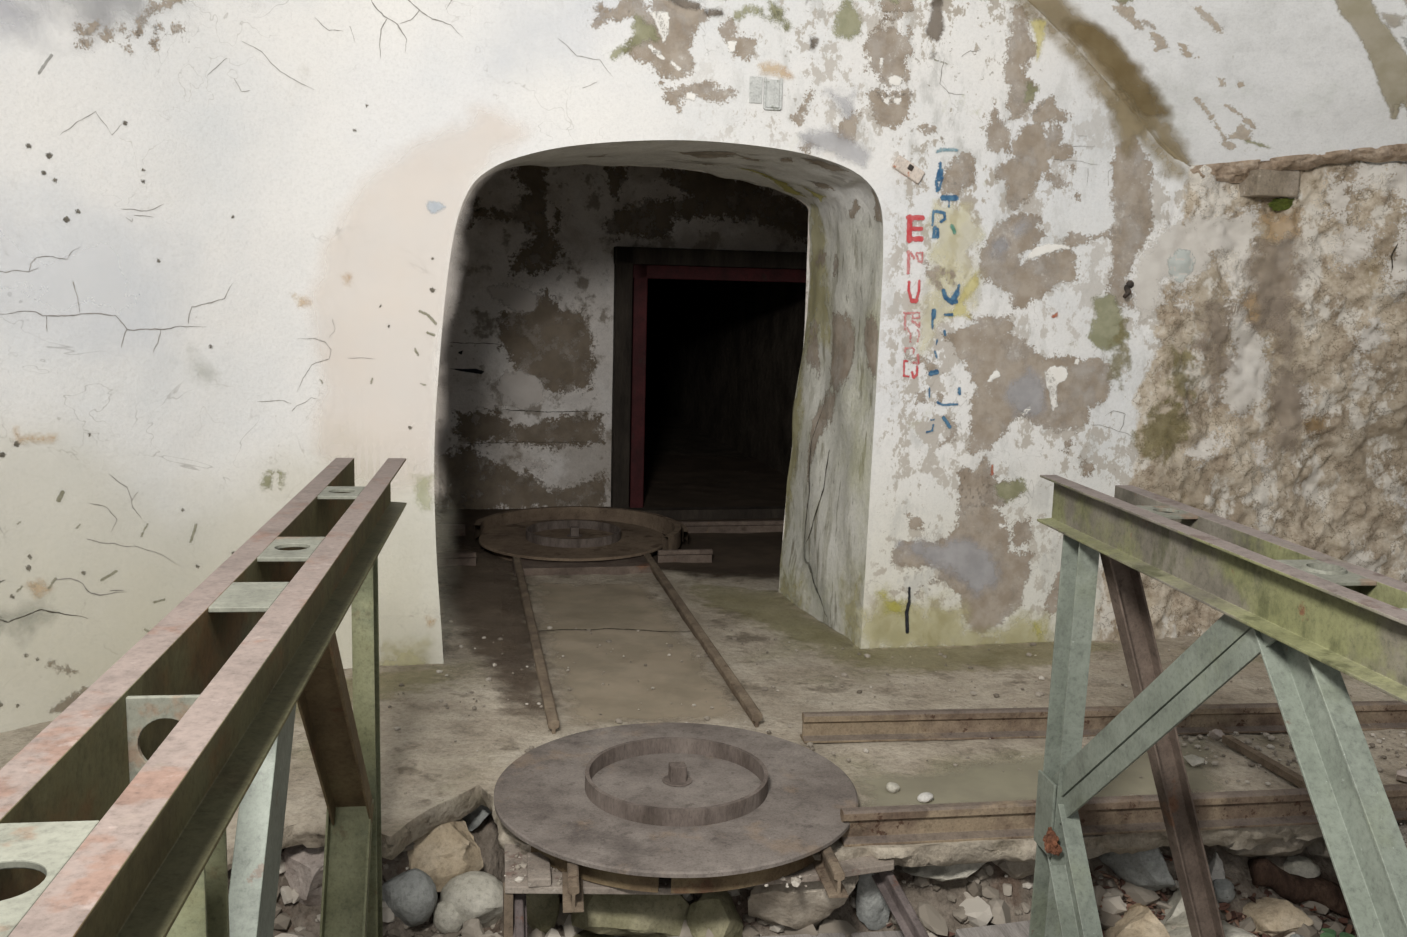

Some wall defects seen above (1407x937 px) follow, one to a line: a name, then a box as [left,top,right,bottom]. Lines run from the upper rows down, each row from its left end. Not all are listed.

crack [319,0,459,57]
peeling [589,0,759,113]
peeling [781,0,937,191]
water stain [1018,0,1190,175]
water stain [1335,0,1407,119]
peeling [590,151,839,277]
peeling [848,189,882,223]
crack [0,248,233,352]
peeling [434,165,610,510]
peeling [805,310,878,482]
peeling [890,0,1407,636]